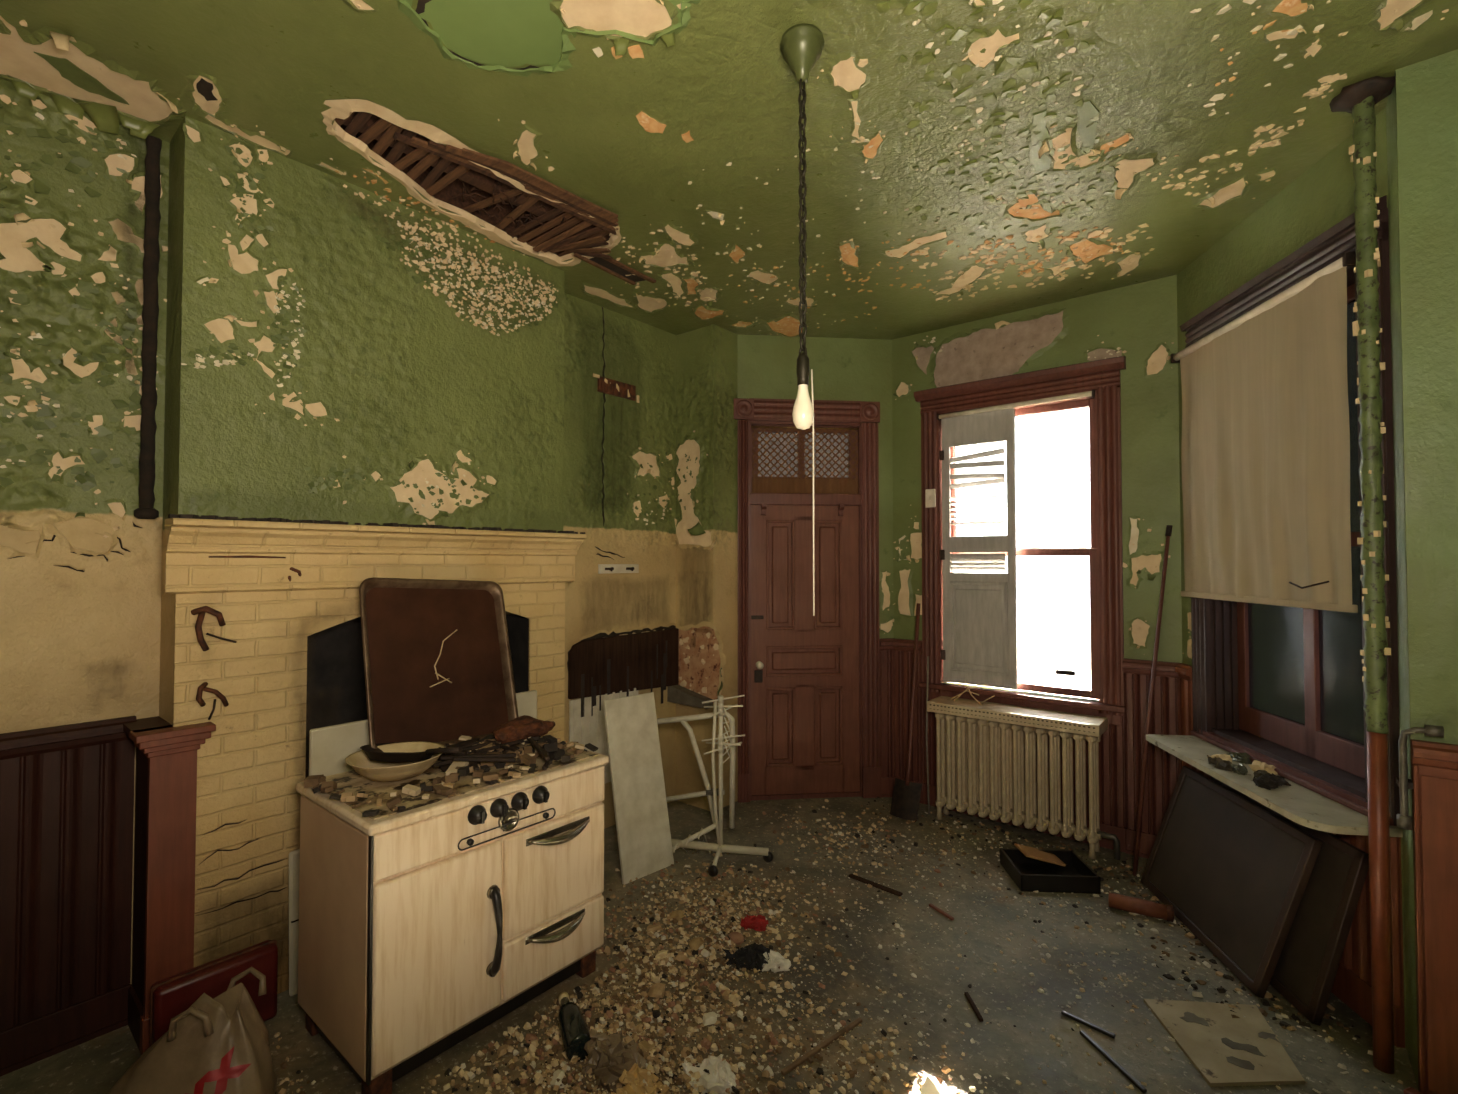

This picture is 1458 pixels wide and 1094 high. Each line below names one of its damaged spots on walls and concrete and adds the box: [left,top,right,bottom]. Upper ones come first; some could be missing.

peeling [1367,0,1449,32]
peeling [512,120,555,171]
peeling [580,0,1348,338]
peeling [0,9,340,522]
spalling [314,158,558,336]
spalling [893,308,1070,400]
peeling [1352,302,1382,344]
peeling [304,448,498,525]
peeling [627,431,716,550]
crack [7,521,143,572]
peeling [879,516,922,634]
peeling [1357,521,1390,628]